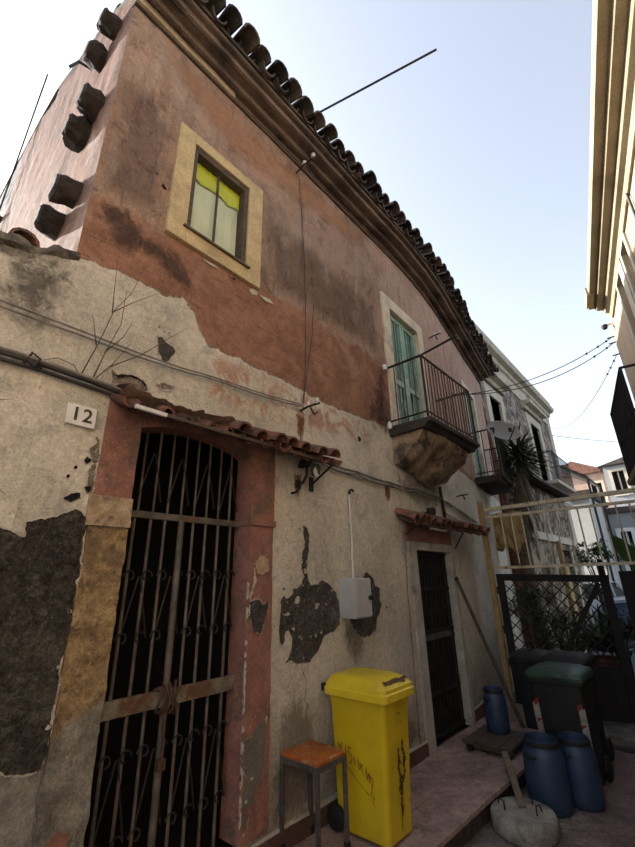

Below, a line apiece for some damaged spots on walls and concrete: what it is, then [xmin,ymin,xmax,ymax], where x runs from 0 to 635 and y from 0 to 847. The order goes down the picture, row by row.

water stain [105,208,190,286]
spalling [108,367,176,392]
flaking render [156,326,177,362]
flaking render [0,436,101,778]
peeling [246,555,269,634]
flaking render [279,525,341,664]
flaking render [346,571,388,645]
peeling [238,716,267,837]